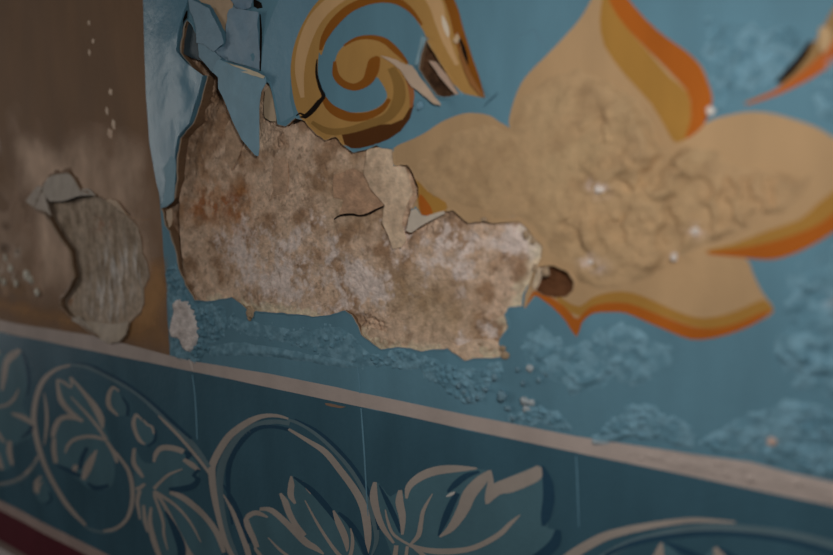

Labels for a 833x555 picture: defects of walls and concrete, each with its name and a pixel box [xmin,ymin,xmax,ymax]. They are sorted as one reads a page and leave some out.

peeling [26,167,151,345]
flaking render [160,0,577,363]